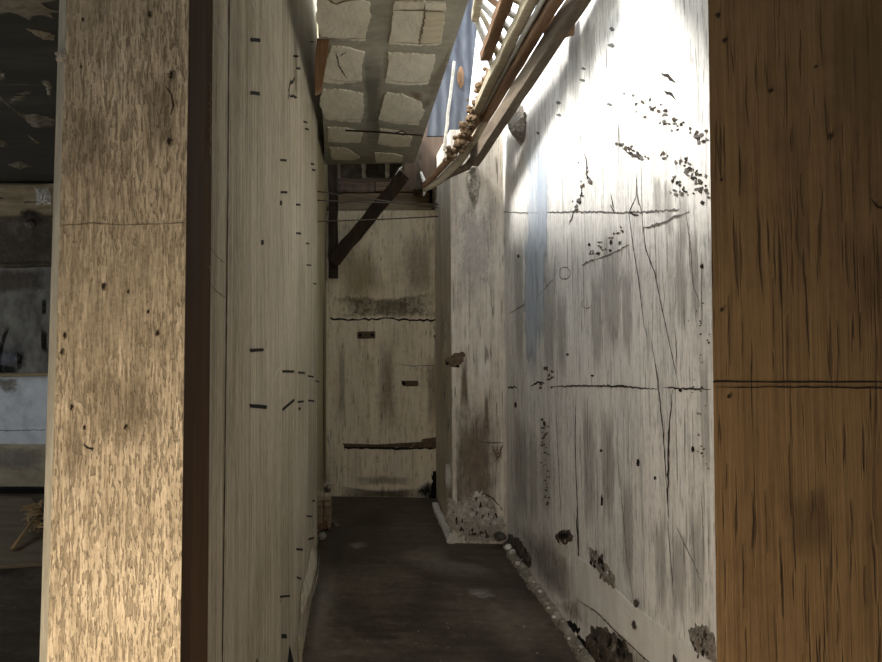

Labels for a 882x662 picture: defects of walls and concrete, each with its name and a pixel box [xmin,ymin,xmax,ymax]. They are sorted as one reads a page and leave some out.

water stain [348,258,426,317]
water stain [525,163,547,357]
crack [548,125,709,595]
spalling [445,490,531,568]
spalling [566,620,633,662]
spalling [688,623,717,662]